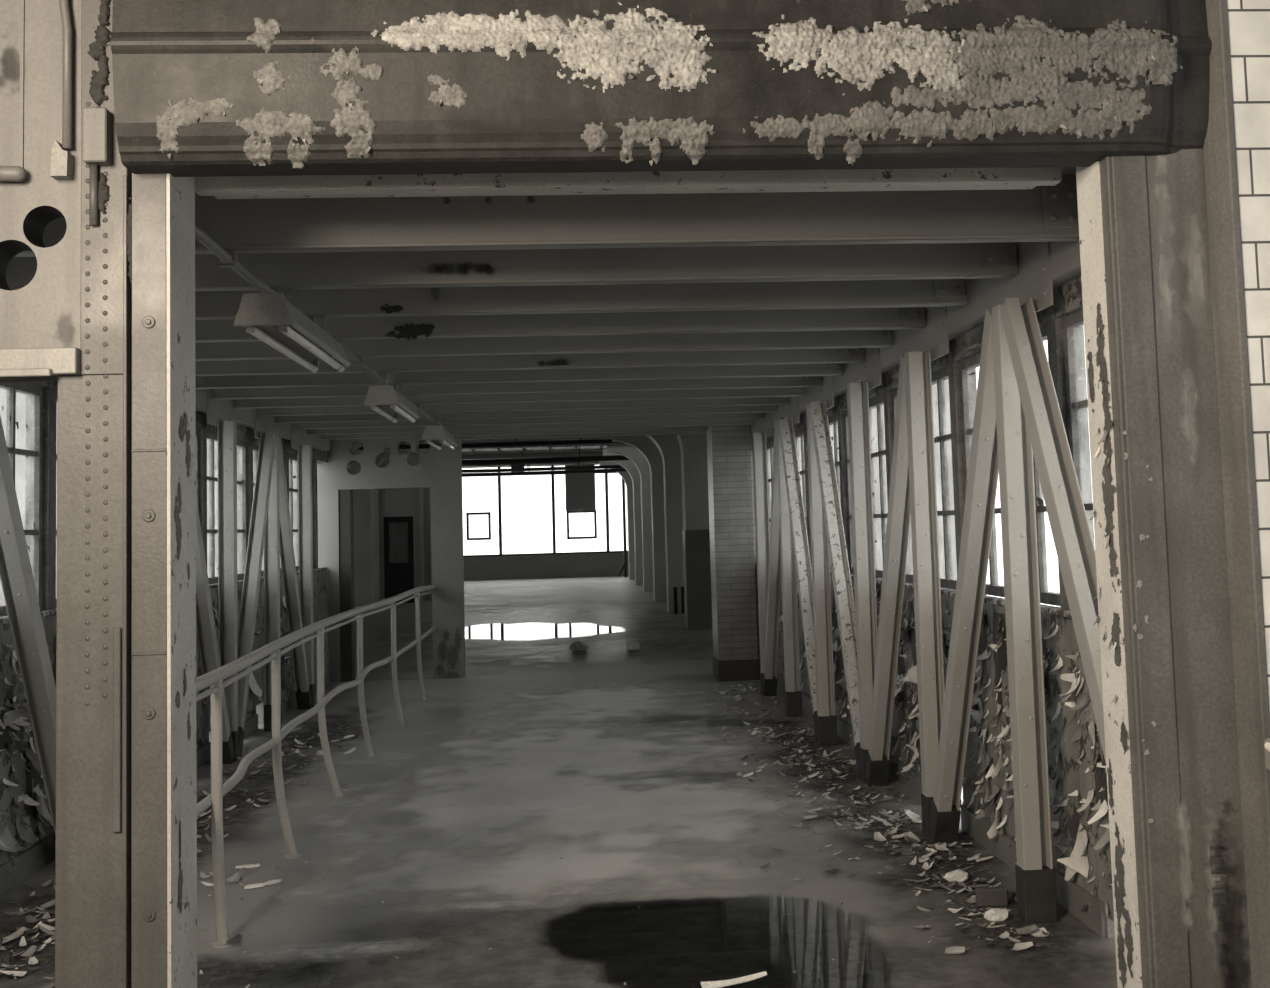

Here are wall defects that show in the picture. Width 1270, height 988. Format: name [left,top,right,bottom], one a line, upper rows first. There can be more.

peeling [156,17,383,168]
peeling [428,74,467,109]
peeling [371,2,717,93]
peeling [581,117,715,166]
peeling [743,0,1183,165]
peeling [1075,291,1129,599]
peeling [0,643,53,873]
peeling [48,634,56,683]
peeling [890,594,921,780]
peeling [942,610,952,660]
peeling [960,609,1017,864]
peeling [1093,611,1149,667]